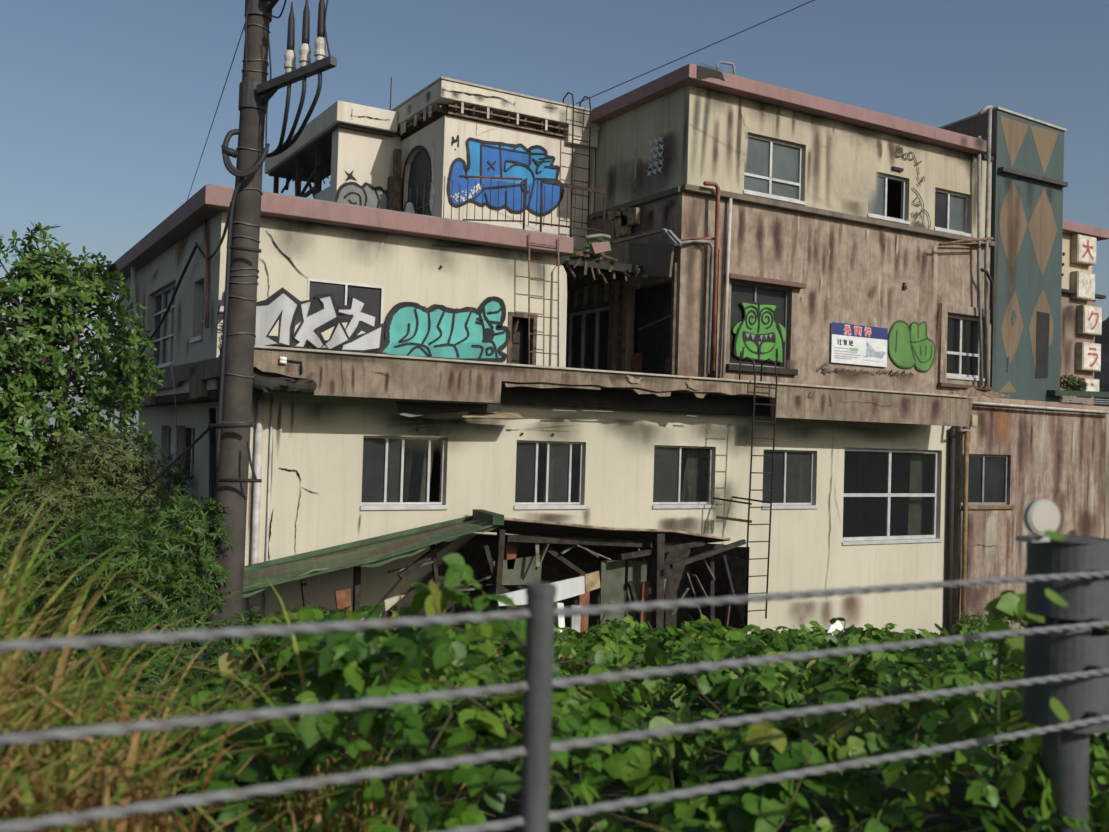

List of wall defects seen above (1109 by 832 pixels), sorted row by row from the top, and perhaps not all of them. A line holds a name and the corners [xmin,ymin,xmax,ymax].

damp [661,102,709,173]
damp [809,134,831,175]
damp [856,145,877,192]
crack [260,230,308,297]
rust [760,219,781,251]
rust [810,224,842,272]
rust [811,292,828,318]
rust [969,408,994,440]
rust [1020,422,1033,465]
rust [1080,431,1106,475]
crack [268,467,319,561]
rust [1060,513,1092,537]